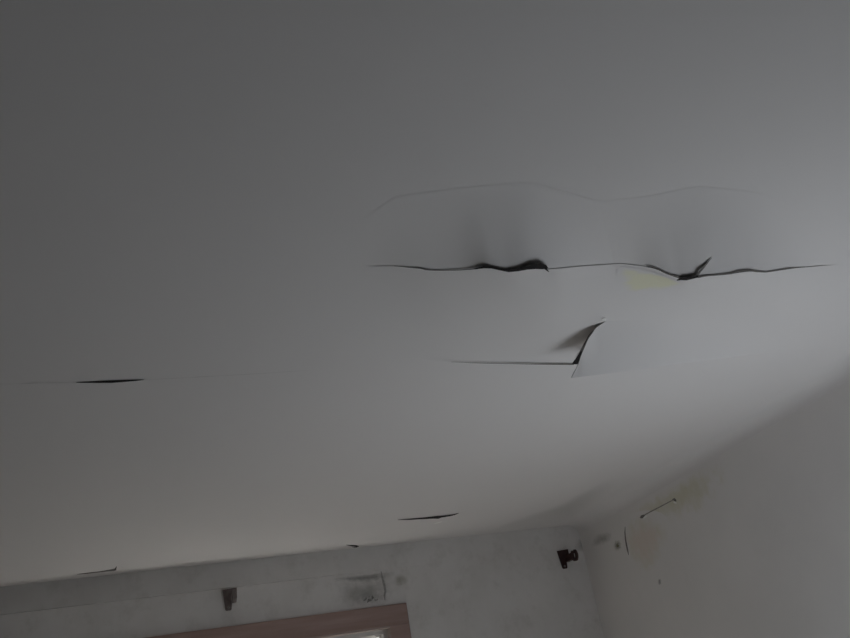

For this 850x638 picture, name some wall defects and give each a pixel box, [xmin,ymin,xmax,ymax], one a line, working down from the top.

crack [398,263,549,272]
crack [647,259,802,281]
peeling [363,264,850,378]
crack [461,359,574,367]
crack [0,370,308,384]
crack [640,498,677,518]
crack [399,513,458,524]